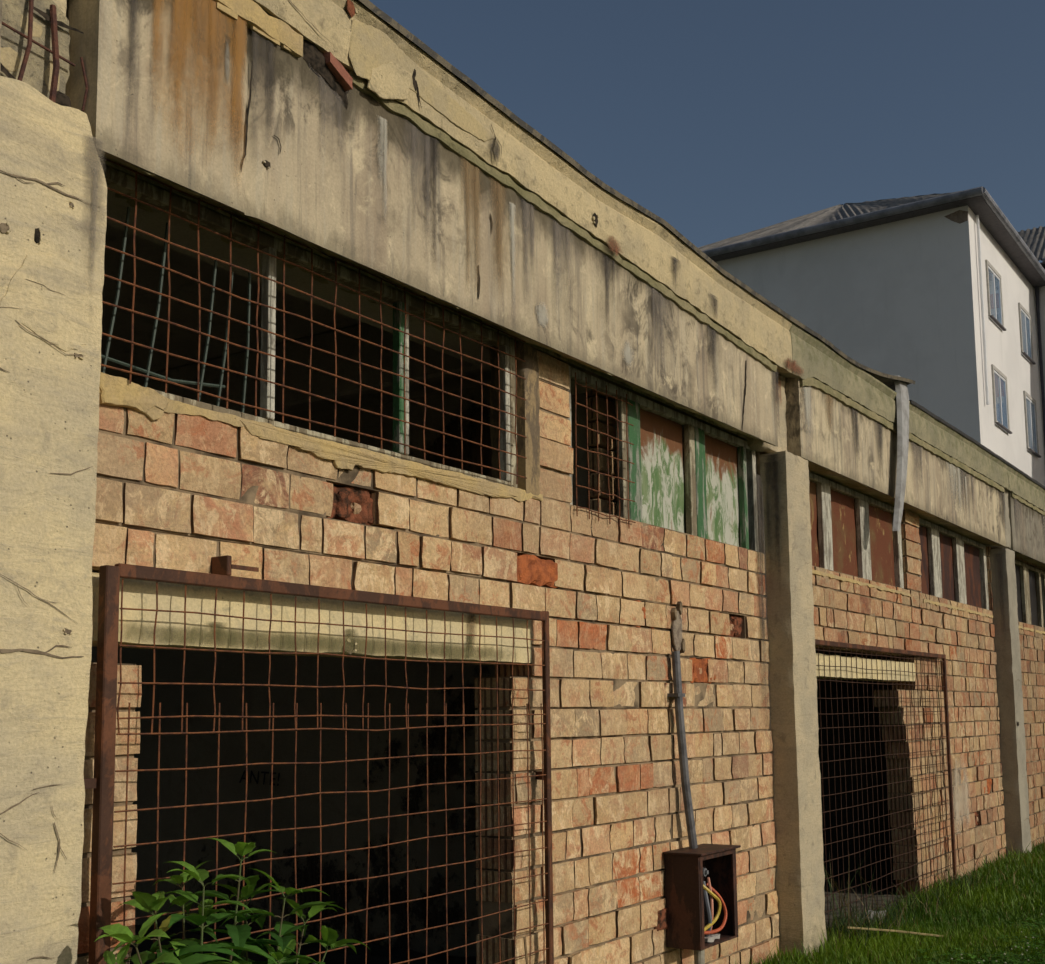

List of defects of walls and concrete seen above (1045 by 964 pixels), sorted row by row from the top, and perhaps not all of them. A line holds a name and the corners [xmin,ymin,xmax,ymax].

rust [155,0,246,140]
peeling [214,0,495,142]
crack [241,61,253,172]
crack [0,170,99,207]
leakage [708,325,717,354]
peeling [240,420,517,498]
leakage [426,399,492,477]
spalling [326,486,386,528]
spalling [513,554,558,588]
crack [0,574,84,659]
crack [0,784,67,873]
mould [196,834,473,955]